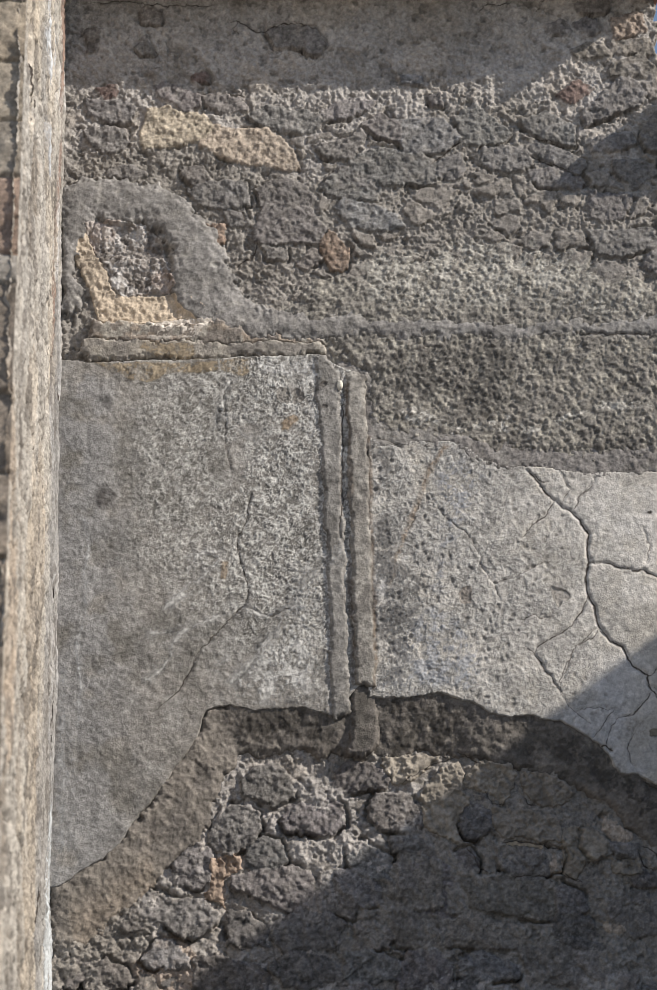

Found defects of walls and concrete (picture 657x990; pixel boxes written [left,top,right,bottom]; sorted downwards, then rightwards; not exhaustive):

flaking render [74,219,217,340]
crack [198,379,252,465]
spalling [276,387,304,403]
crack [145,393,345,712]
crack [408,497,542,597]
crack [521,471,657,790]
crack [403,752,477,783]
peeling [380,754,644,881]
peeling [204,853,246,910]